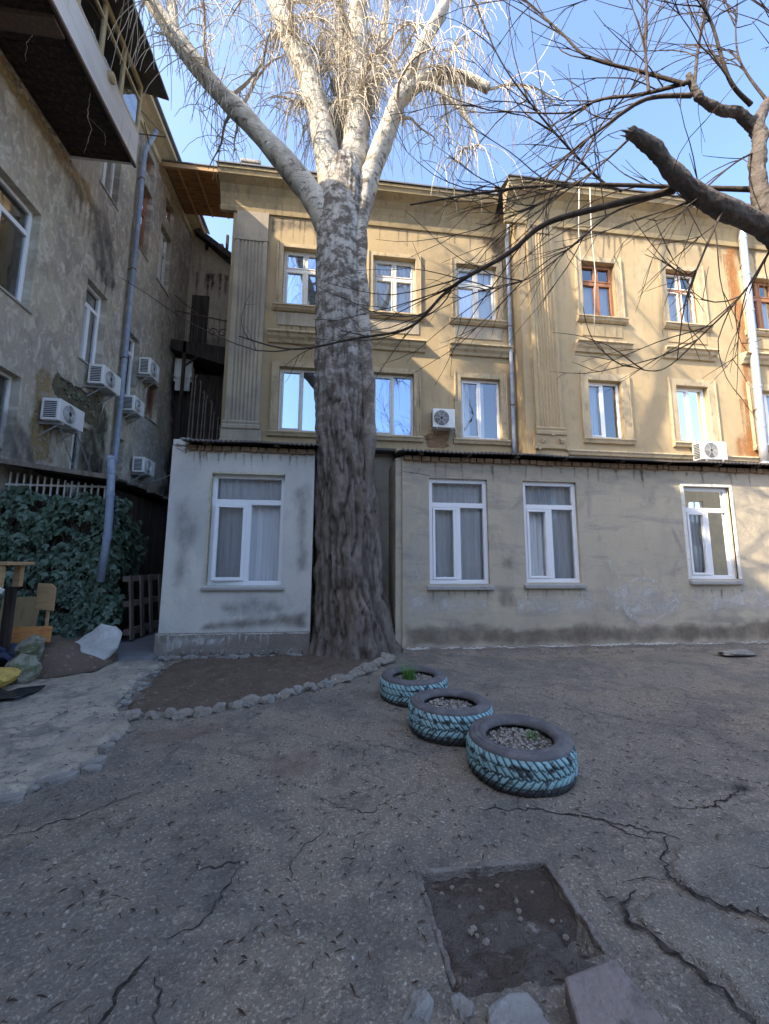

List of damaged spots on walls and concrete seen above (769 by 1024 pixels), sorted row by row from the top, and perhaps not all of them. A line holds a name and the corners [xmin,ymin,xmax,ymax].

rust [723,247,758,455]
damp [456,622,769,643]